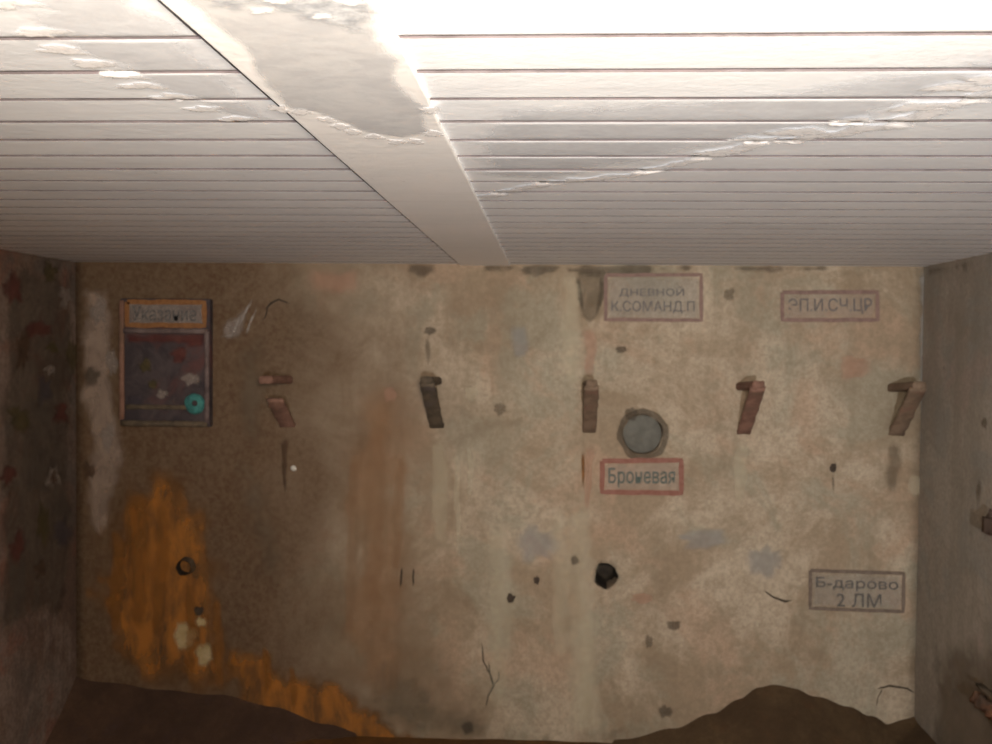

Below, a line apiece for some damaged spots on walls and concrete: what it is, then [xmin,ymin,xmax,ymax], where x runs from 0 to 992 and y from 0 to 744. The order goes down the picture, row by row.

peeling [192,0,443,145]
corrosion [105,479,411,738]